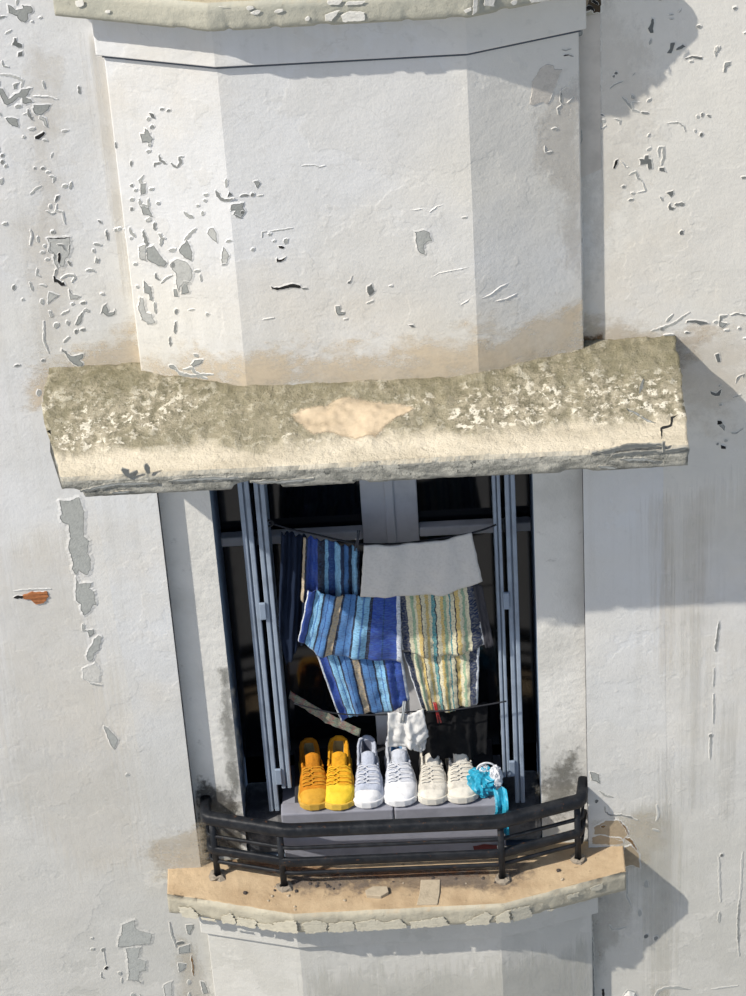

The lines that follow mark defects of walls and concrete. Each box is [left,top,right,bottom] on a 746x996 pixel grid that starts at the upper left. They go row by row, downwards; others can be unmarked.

peeling [0,0,43,57]
peeling [0,60,70,142]
peeling [139,107,184,169]
peeling [11,152,264,367]
crack [650,311,746,339]
peeling [293,398,412,439]
crack [626,379,679,439]
corrosion [13,588,52,604]
peeling [56,463,314,686]
corrosion [233,861,486,878]
flaking render [590,818,642,869]
peeling [162,906,450,996]